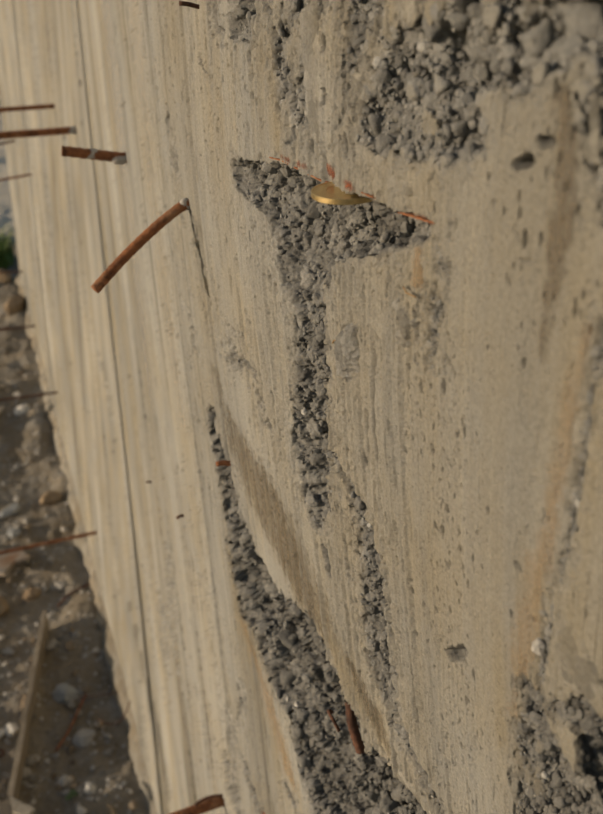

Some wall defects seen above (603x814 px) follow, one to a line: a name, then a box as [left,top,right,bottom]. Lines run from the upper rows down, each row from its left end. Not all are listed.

spalling [354,0,603,198]
spalling [218,322,275,439]
spalling [232,157,416,291]
spalling [416,222,455,375]
spalling [559,335,603,586]
spalling [239,580,440,814]
spalling [350,480,417,760]
peeling [516,597,603,814]